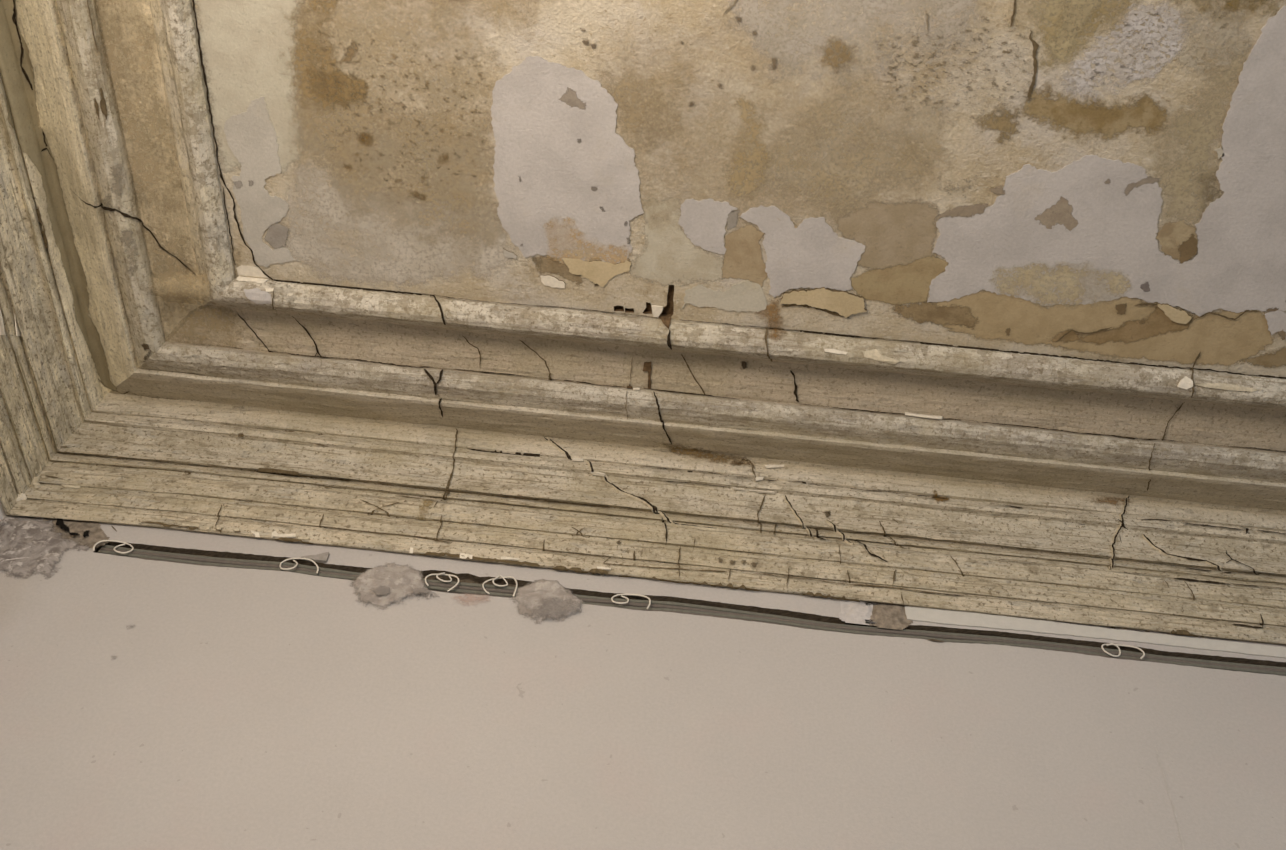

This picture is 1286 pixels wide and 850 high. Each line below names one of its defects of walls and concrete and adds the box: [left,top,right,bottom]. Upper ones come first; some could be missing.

crack [78,197,197,276]
water stain [193,0,511,284]
peeling [318,32,644,288]
crack [190,0,1286,605]
peeling [652,198,867,329]
water stain [731,0,974,69]
peeling [824,349,901,364]
spalling [880,17,1027,111]
water stain [729,98,1286,368]
water stain [1030,0,1133,66]
peeling [927,3,1286,340]
water stain [977,52,1247,224]